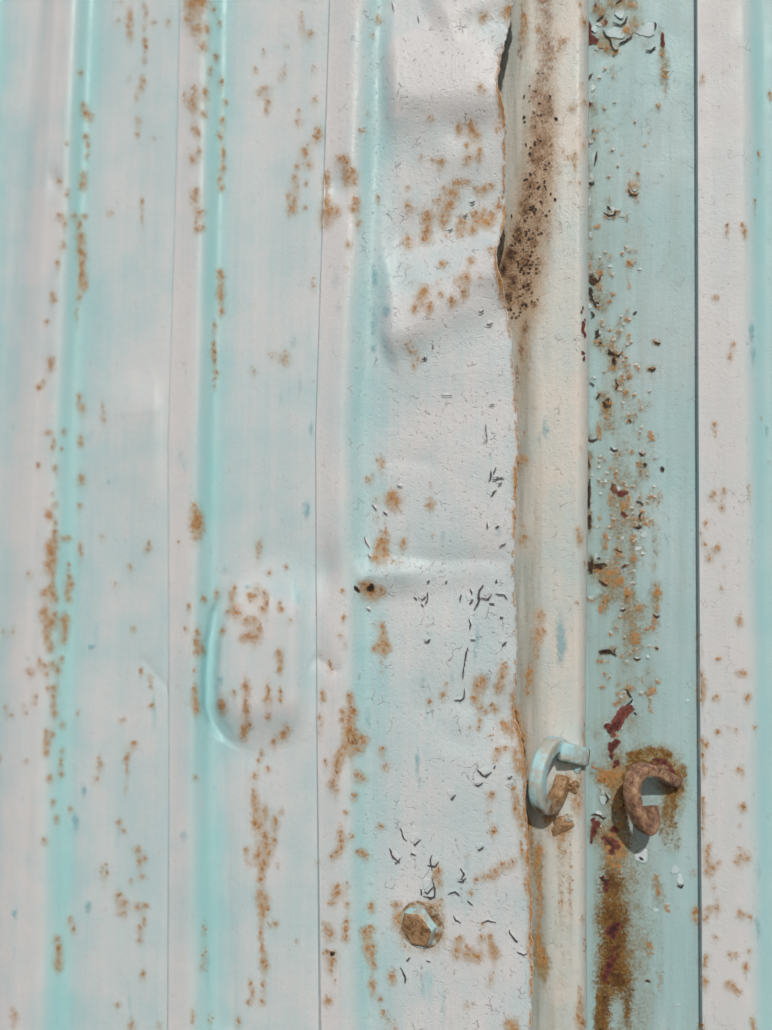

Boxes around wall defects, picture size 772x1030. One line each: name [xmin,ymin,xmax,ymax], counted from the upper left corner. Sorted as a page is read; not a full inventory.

peeling [589,0,670,91]
corrosion [322,174,359,224]
corrosion [338,155,357,185]
corrosion [405,0,576,410]
corrosion [512,423,528,541]
corrosion [28,511,82,675]
corrosion [201,586,291,643]
corrosion [233,683,251,738]
corrosion [324,694,368,790]
corrosion [619,746,687,848]
corrosion [245,774,277,969]
peeling [422,857,438,900]